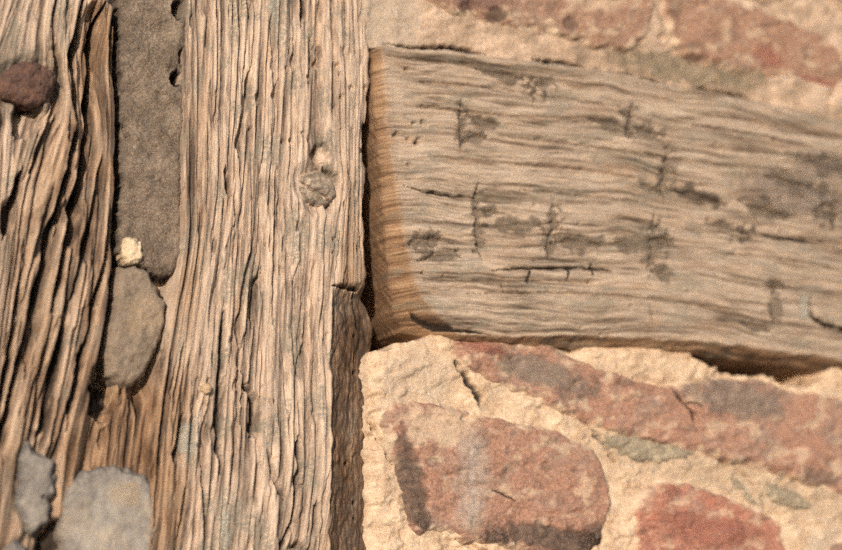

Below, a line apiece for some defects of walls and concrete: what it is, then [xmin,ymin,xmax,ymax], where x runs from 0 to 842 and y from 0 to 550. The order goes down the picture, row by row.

crack [454,364,479,404]